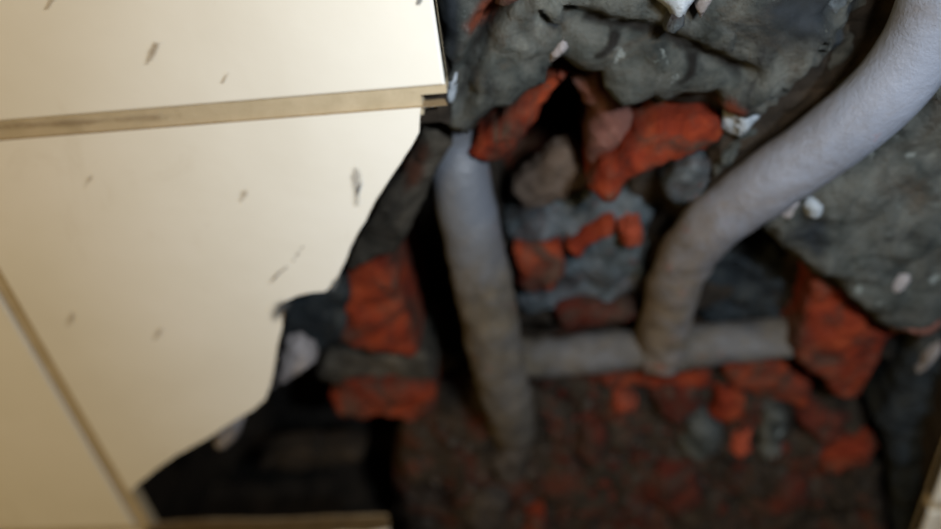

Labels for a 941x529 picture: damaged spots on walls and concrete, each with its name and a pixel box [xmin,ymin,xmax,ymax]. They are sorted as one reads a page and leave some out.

spalling [438,0,866,203]
spalling [0,99,454,492]
spalling [512,212,643,293]
spalling [555,293,637,328]
spalling [596,86,941,529]